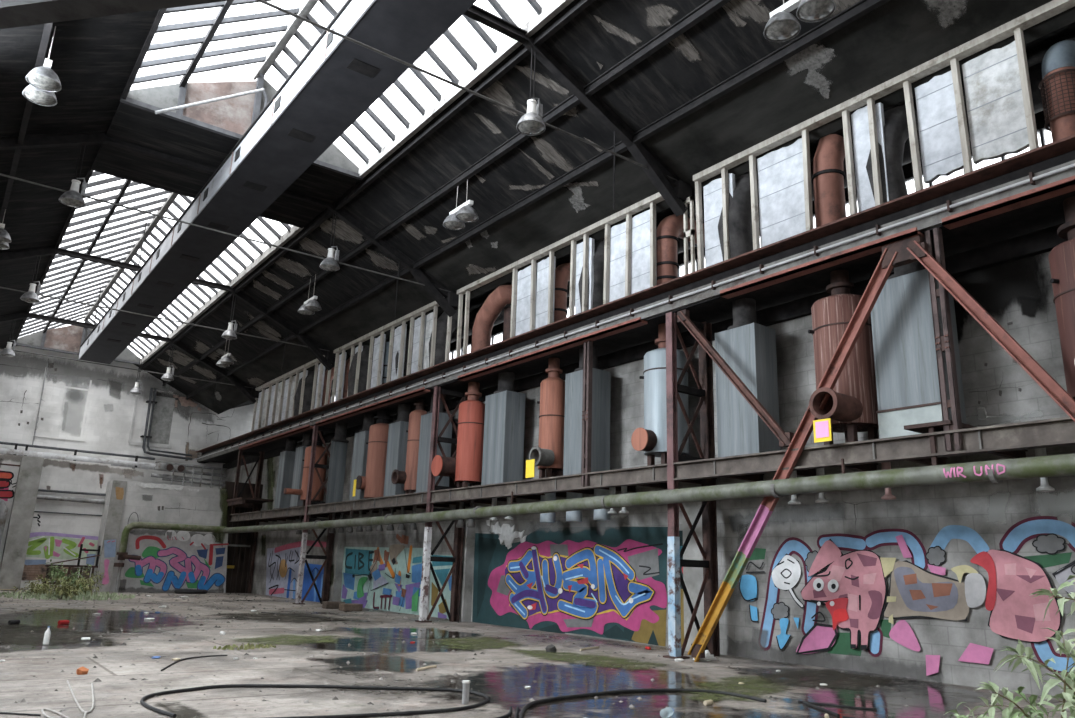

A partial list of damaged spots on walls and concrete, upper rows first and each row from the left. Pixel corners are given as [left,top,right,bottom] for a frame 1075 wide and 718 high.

peeling [593,15,641,44]
peeling [645,4,679,27]
peeling [831,0,861,17]
peeling [922,0,967,28]
peeling [668,34,701,61]
peeling [783,43,835,99]
peeling [514,65,578,117]
peeling [509,136,598,213]